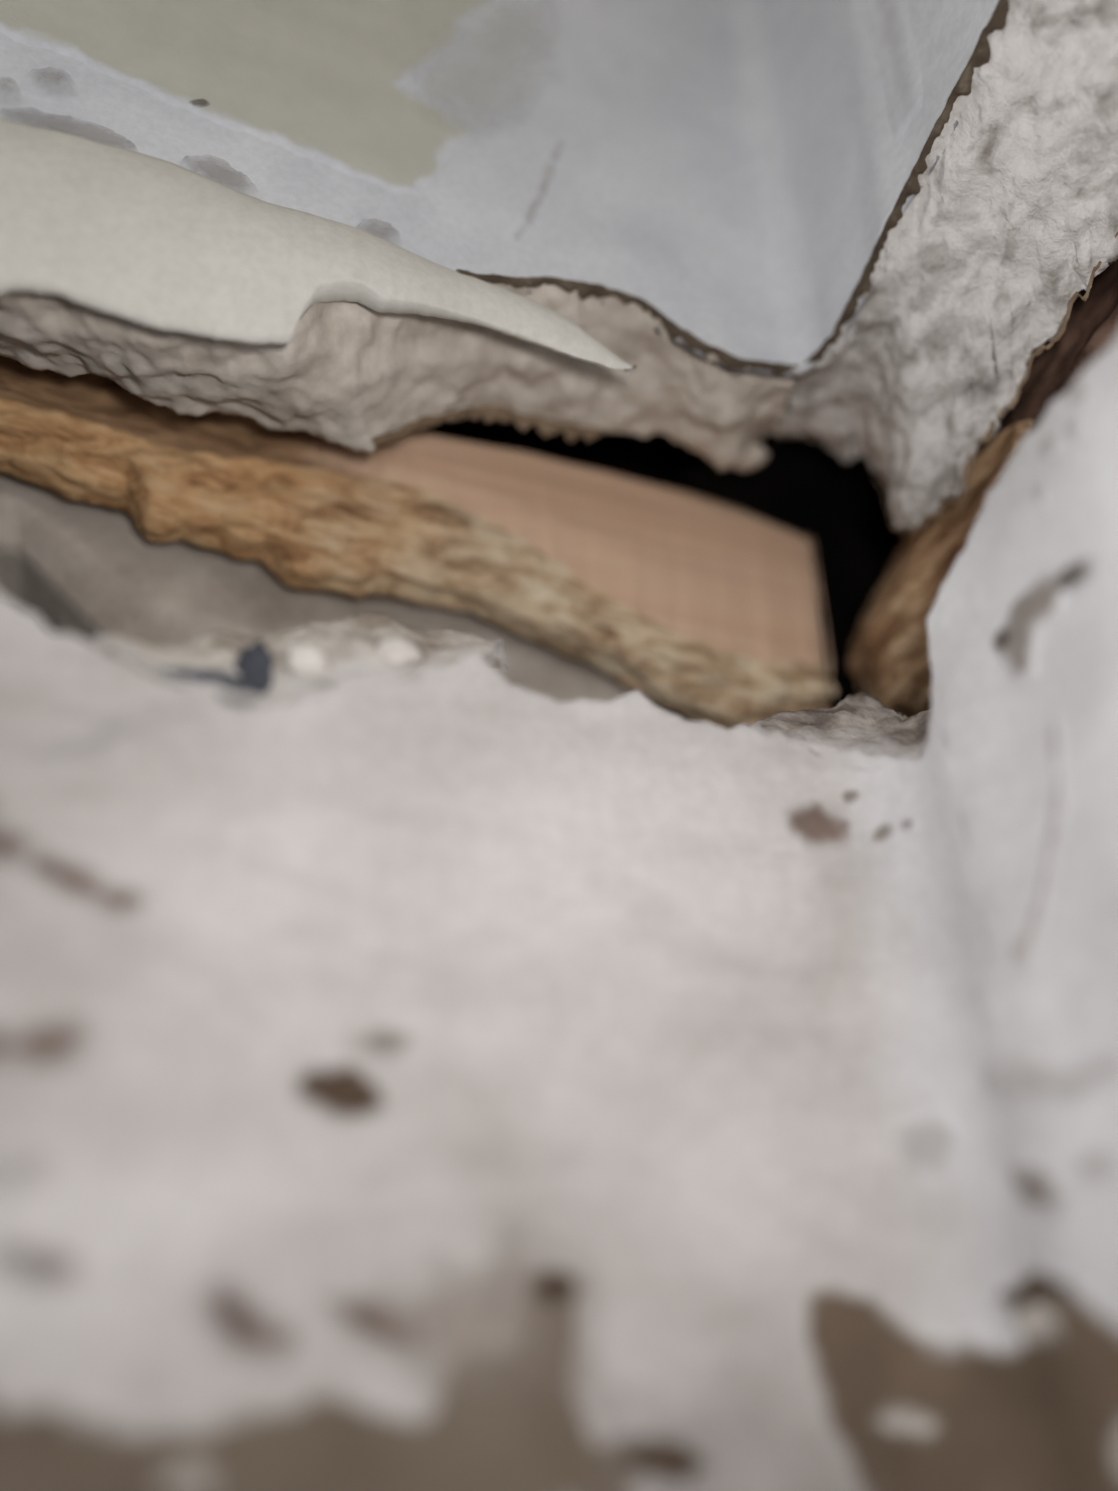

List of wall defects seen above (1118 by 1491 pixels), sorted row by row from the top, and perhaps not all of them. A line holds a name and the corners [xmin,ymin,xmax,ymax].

flaking render [0,0,1118,534]
flaking render [89,613,509,706]
flaking render [750,692,931,758]
peeling [0,1254,703,1491]
peeling [792,1258,1118,1491]